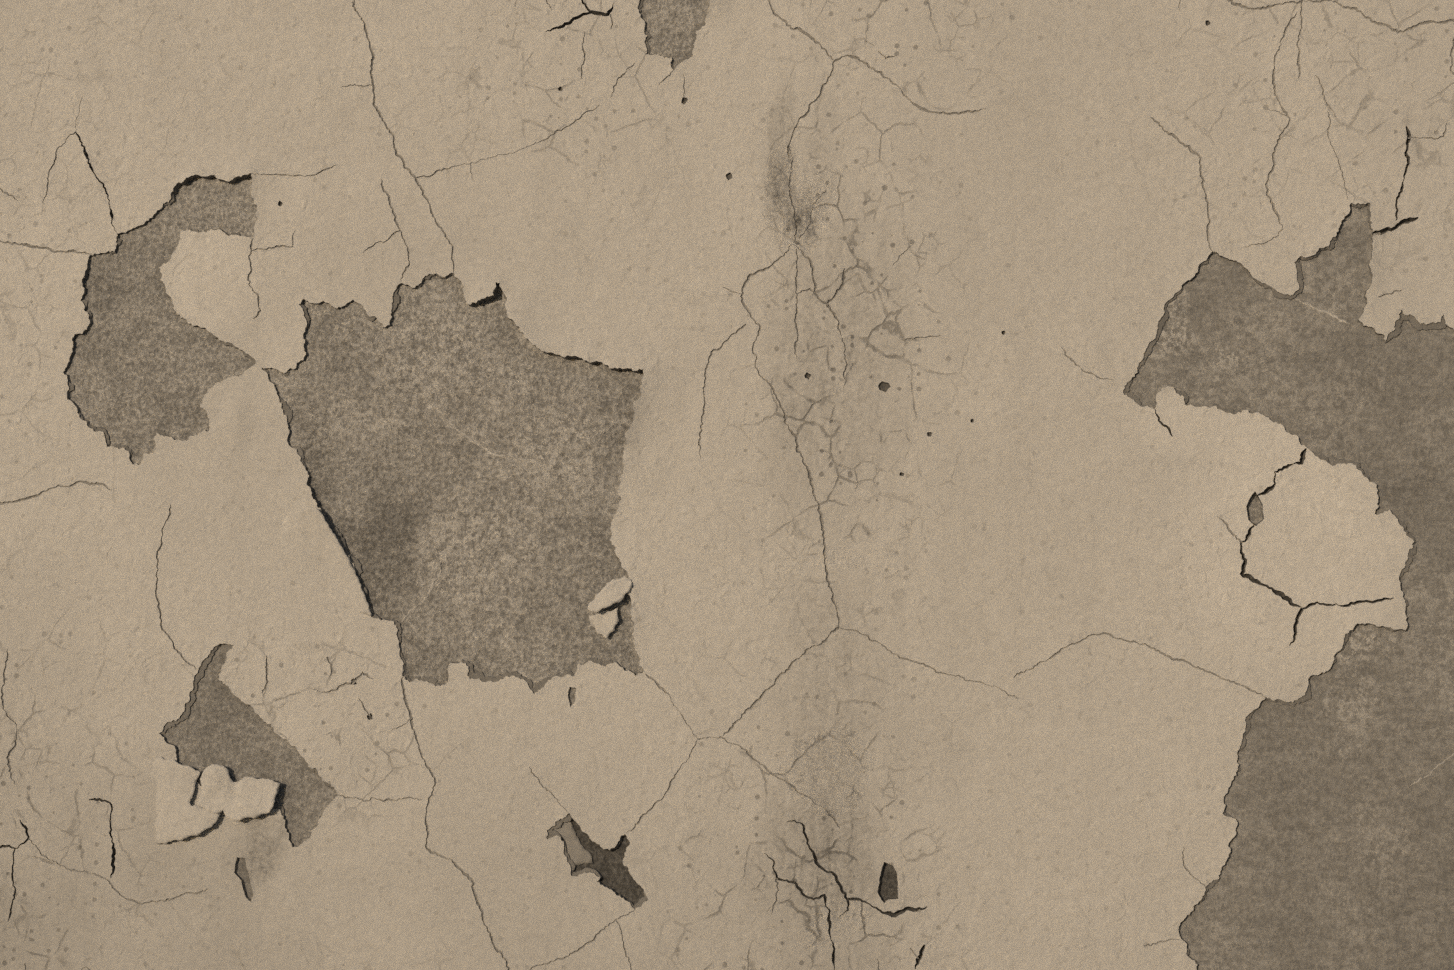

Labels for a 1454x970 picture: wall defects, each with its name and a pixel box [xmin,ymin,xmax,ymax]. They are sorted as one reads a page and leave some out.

crack [342,0,685,279]
peeling [638,0,710,69]
crack [1228,0,1454,247]
peeling [63,173,644,707]
crack [627,0,1265,970]
peeling [1123,203,1454,970]
crack [1218,448,1393,646]
crack [0,798,207,921]
peeling [150,643,337,847]
crack [315,657,634,970]
peeling [546,813,648,909]
peeling [878,862,898,903]